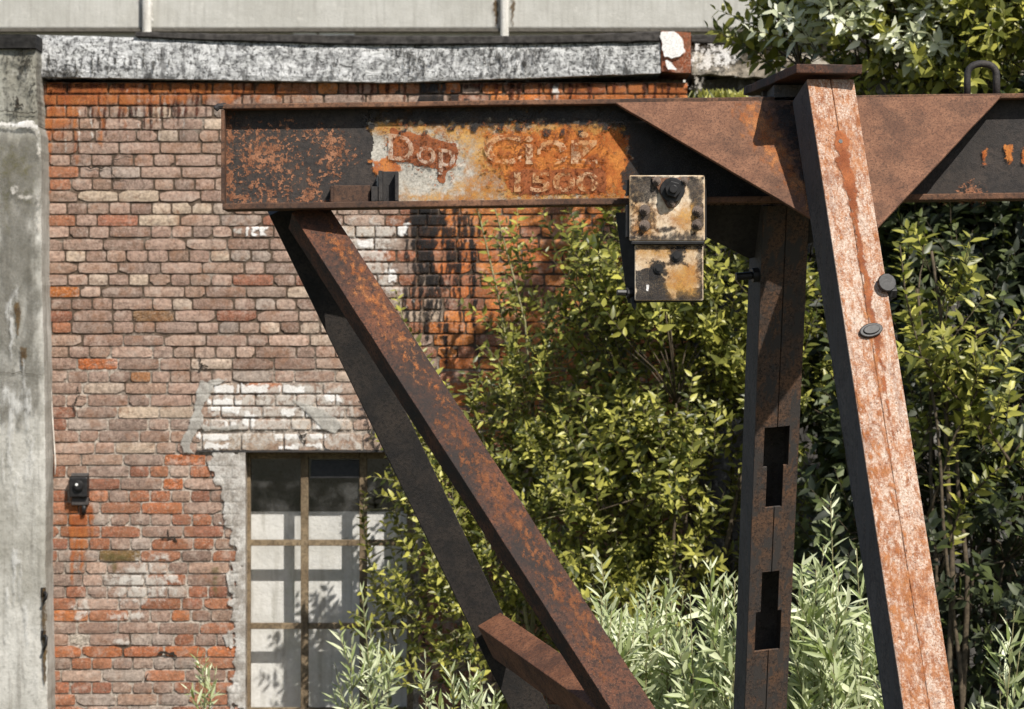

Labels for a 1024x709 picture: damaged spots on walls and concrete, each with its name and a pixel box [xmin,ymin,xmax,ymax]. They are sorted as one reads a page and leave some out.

corrosion [45,83,633,215]
corrosion [327,237,390,325]
water stain [339,209,483,368]
peeling [368,117,634,201]
corrosion [672,205,693,229]
corrosion [667,263,699,296]
corrosion [731,103,809,214]
corrosion [835,130,864,266]
corrosion [1003,144,1024,164]
peeling [163,379,361,709]
corrosion [435,406,613,682]
corrosion [842,298,930,709]